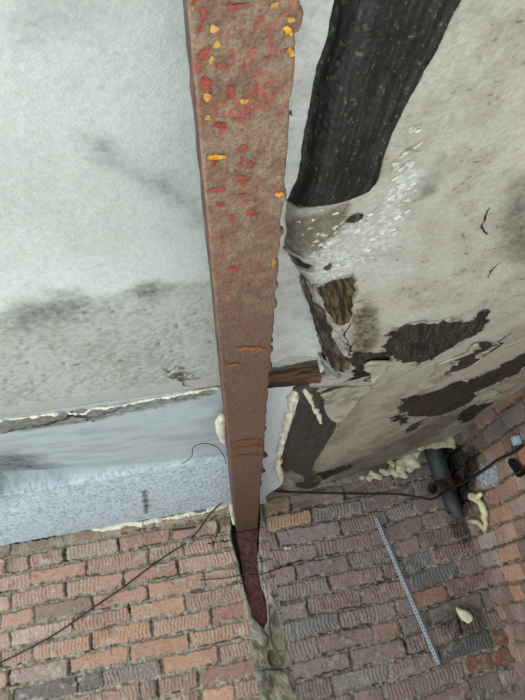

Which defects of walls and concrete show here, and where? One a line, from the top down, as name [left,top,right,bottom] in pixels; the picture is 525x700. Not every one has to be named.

leakage [287,211,346,257]
flaking render [281,0,525,489]
crack [341,298,367,352]
spalling [163,366,194,383]
crack [1,407,124,434]